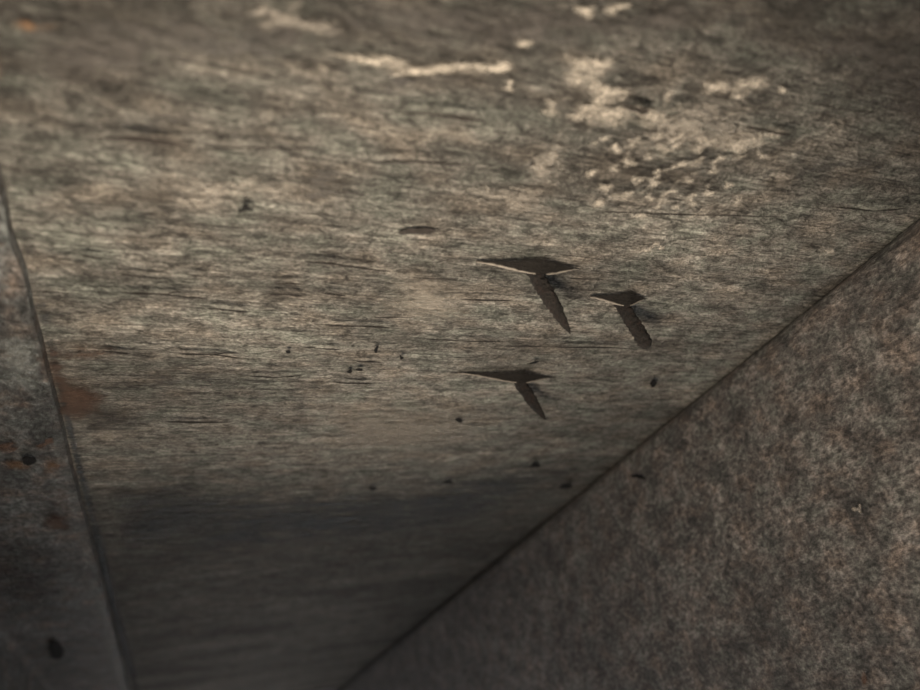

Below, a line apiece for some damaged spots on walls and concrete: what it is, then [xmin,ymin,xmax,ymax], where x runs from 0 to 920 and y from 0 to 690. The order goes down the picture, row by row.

leakage [568,59,780,159]